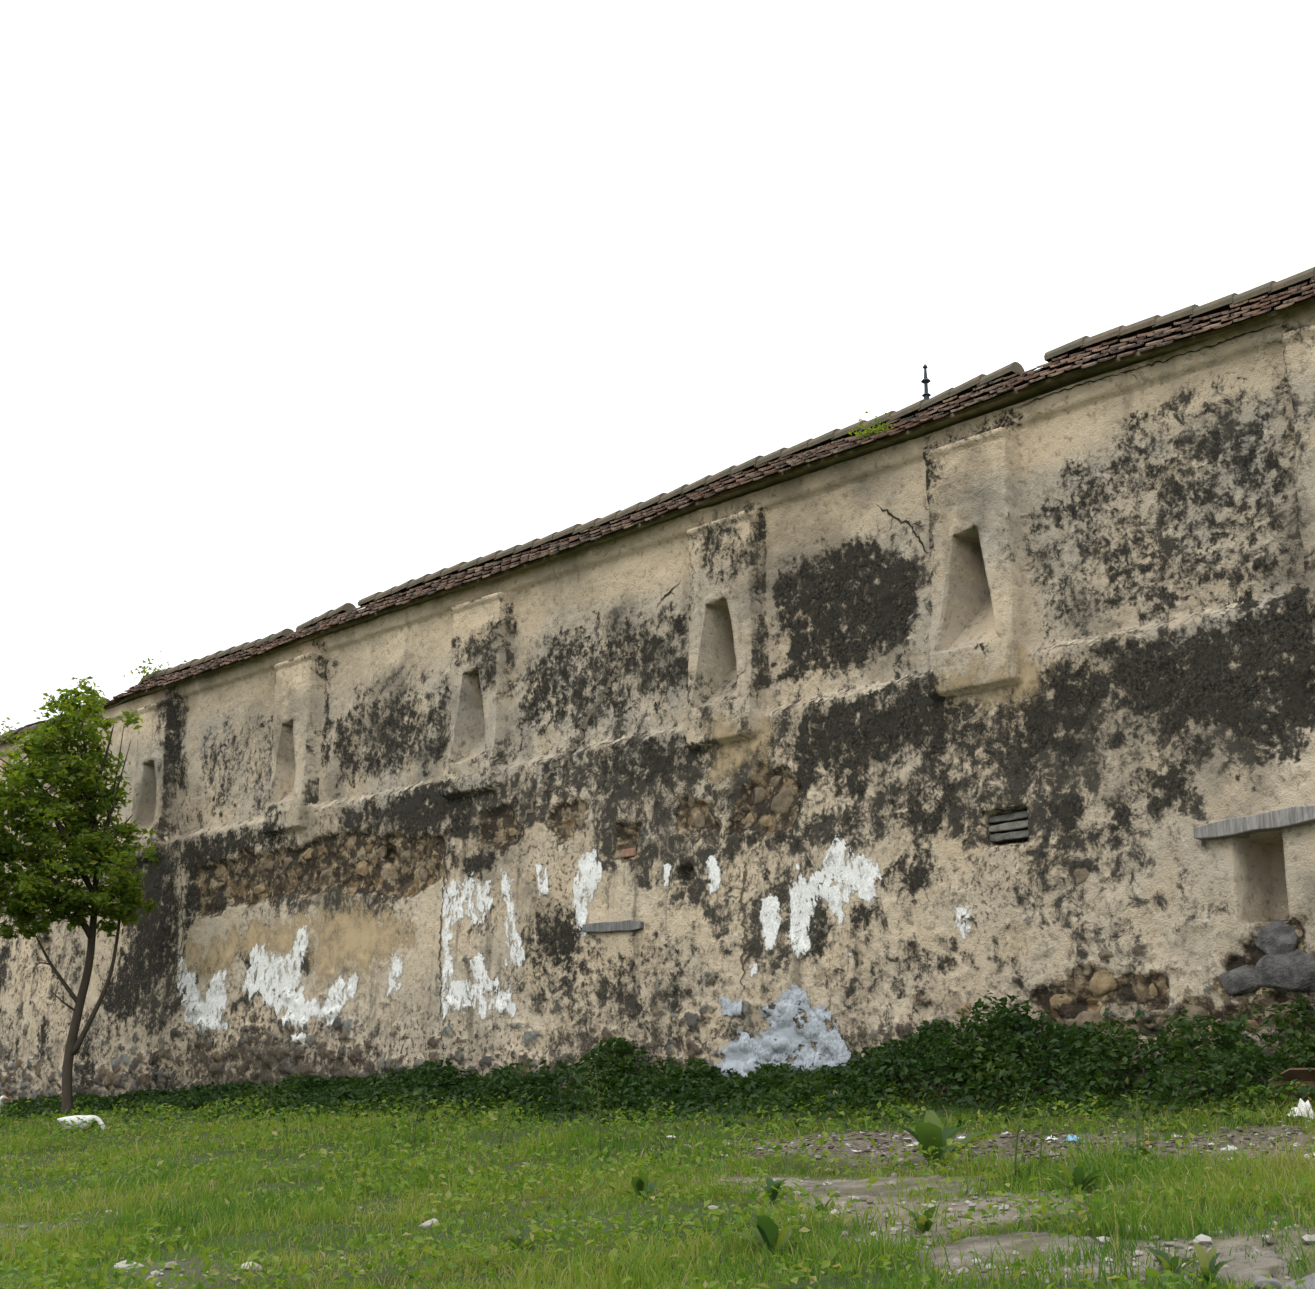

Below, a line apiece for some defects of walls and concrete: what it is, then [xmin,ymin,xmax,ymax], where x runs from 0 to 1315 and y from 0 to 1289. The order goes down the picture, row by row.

flaking render [129,769,459,846]
flaking render [542,789,589,845]
peeling [553,713,882,964]
peeling [535,863,549,896]
flaking render [177,803,525,1045]
peeling [955,904,972,941]
peeling [718,996,742,1017]